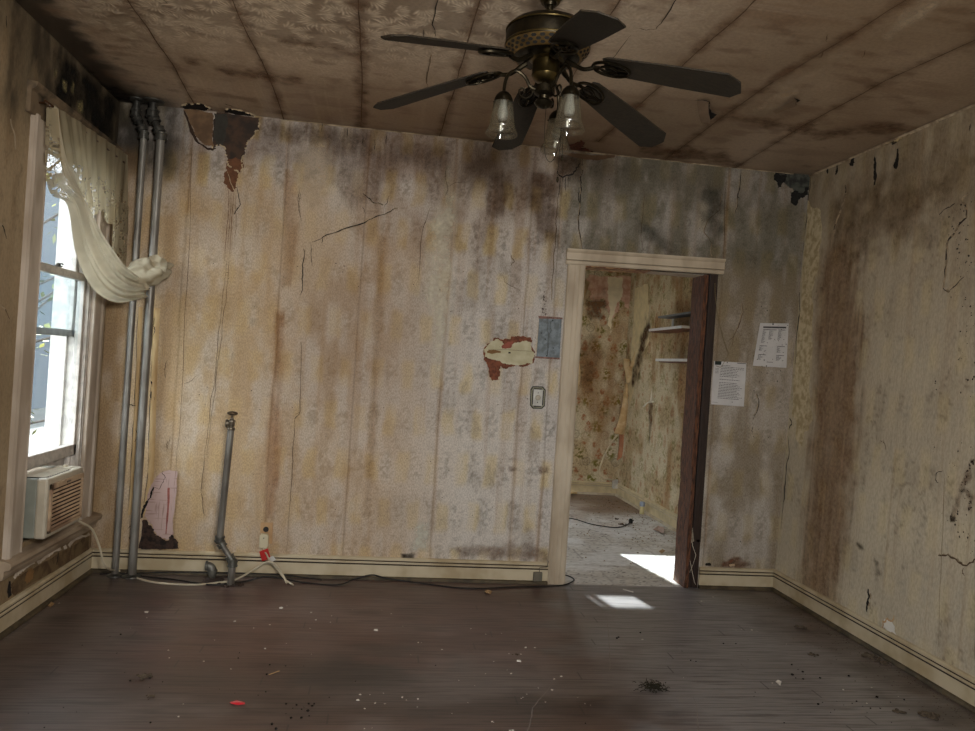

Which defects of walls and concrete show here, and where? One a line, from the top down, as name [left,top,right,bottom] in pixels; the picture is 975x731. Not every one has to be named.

crack [423,0,438,87]
crack [613,0,676,58]
flaking render [181,103,259,160]
water stain [532,157,581,235]
crack [939,193,968,293]
flaking render [583,275,631,333]
peeling [483,336,535,381]
water stain [803,245,863,592]
flaking render [138,470,179,550]
crack [935,471,975,597]